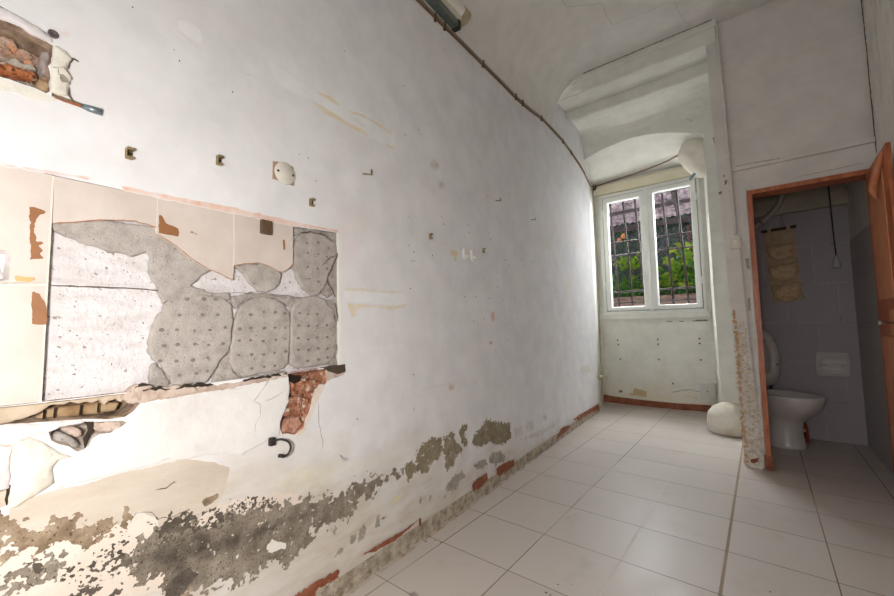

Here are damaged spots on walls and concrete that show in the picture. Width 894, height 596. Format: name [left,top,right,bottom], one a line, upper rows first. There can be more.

spalling [0,7,79,102]
flaking render [0,219,345,452]
water stain [429,417,481,438]
flaking render [732,309,765,468]
water stain [0,531,140,596]
water stain [165,567,198,596]
peeling [0,419,511,596]
water stain [149,441,403,558]